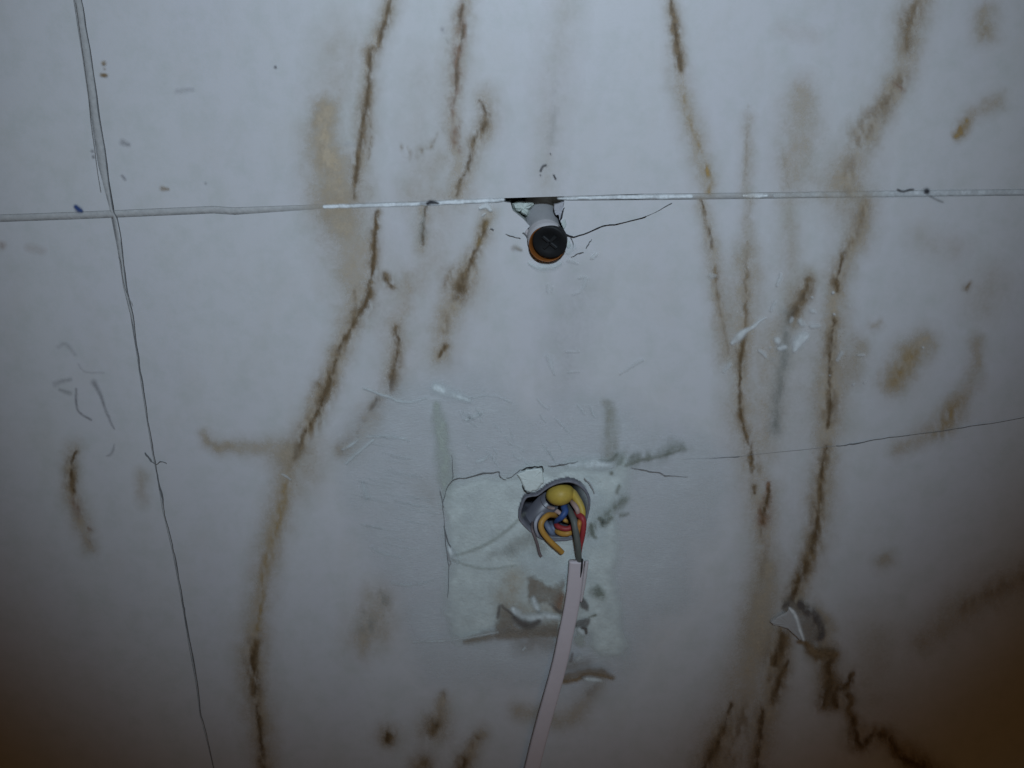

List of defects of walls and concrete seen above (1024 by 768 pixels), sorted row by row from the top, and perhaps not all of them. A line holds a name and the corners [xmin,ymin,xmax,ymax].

corrosion [670,2,691,118]
corrosion [434,212,492,361]
crack [567,203,672,257]
corrosion [787,0,934,605]
corrosion [242,1,400,768]
crack [440,460,521,597]
flaking render [517,466,544,493]
corrosion [692,142,790,768]
crack [634,417,1024,477]
spalling [414,578,563,650]
spalling [576,599,596,634]
spalling [770,601,839,658]